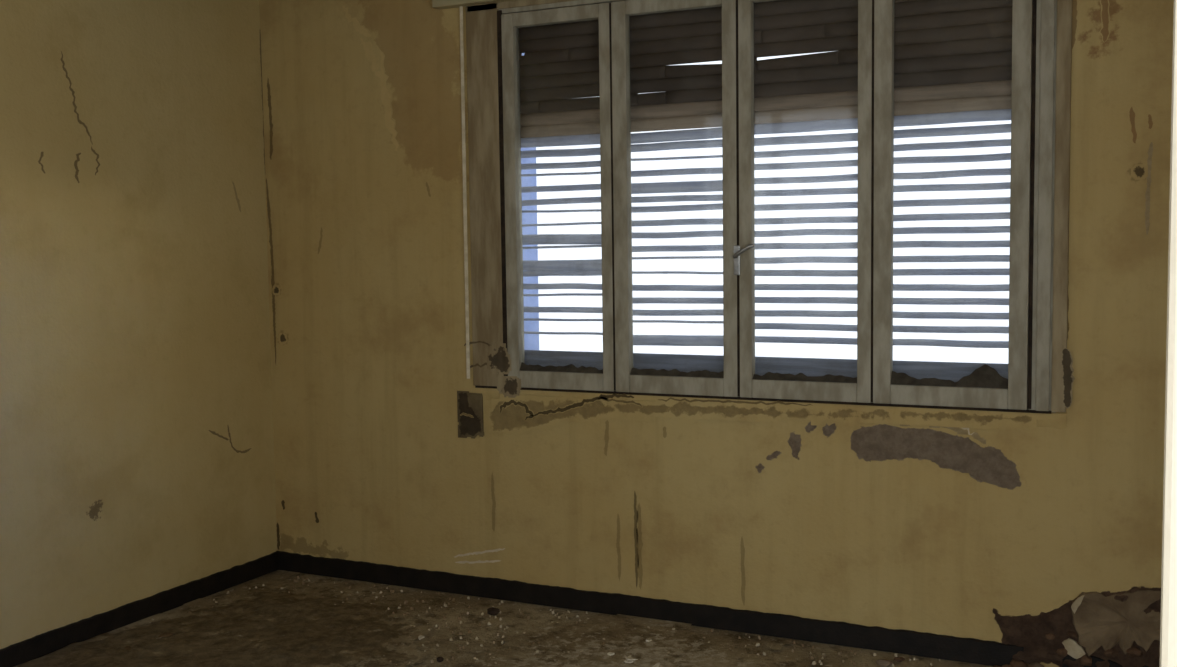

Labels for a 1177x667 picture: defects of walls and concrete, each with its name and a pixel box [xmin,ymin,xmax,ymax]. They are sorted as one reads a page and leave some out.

crack [60,51,101,184]
leakage [337,0,470,201]
crack [38,151,46,174]
flaking render [457,391,484,439]
flaking render [754,420,1027,493]
leakage [616,490,644,590]
flaking render [990,581,1161,667]